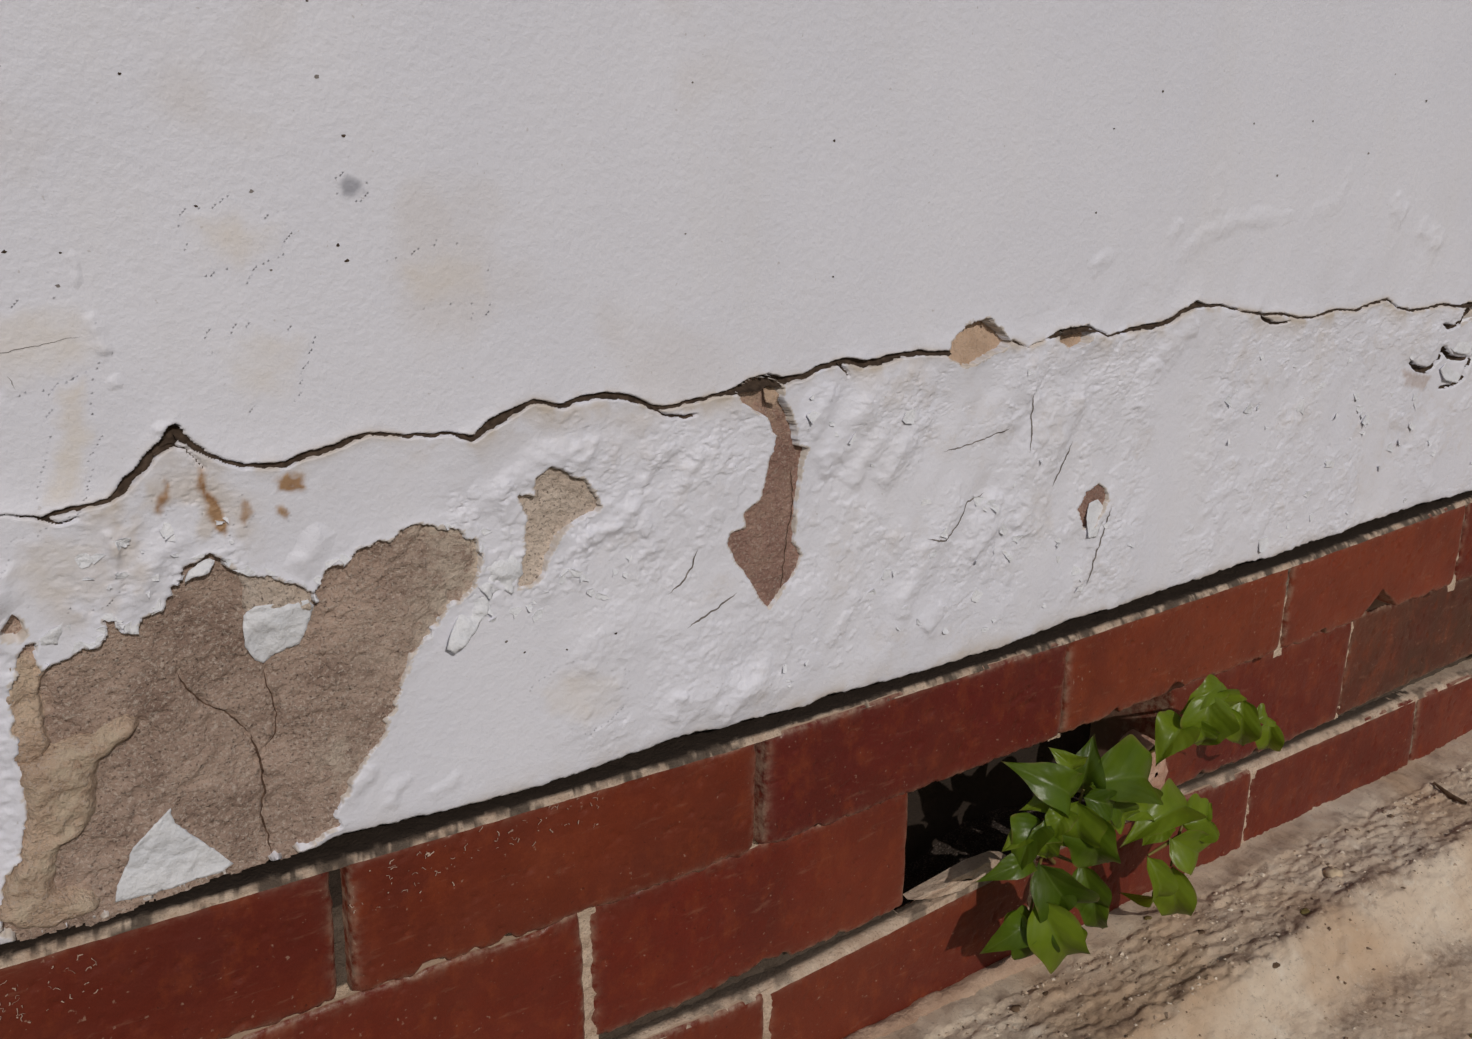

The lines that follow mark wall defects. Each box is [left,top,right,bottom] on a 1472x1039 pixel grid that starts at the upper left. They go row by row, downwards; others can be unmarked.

spalling [948,321,1003,365]
crack [1012,298,1472,348]
crack [2,350,951,525]
peeling [728,377,802,606]
crack [945,396,1072,485]
peeling [1077,484,1105,538]
spalling [0,467,597,941]
spalling [893,799,1046,910]